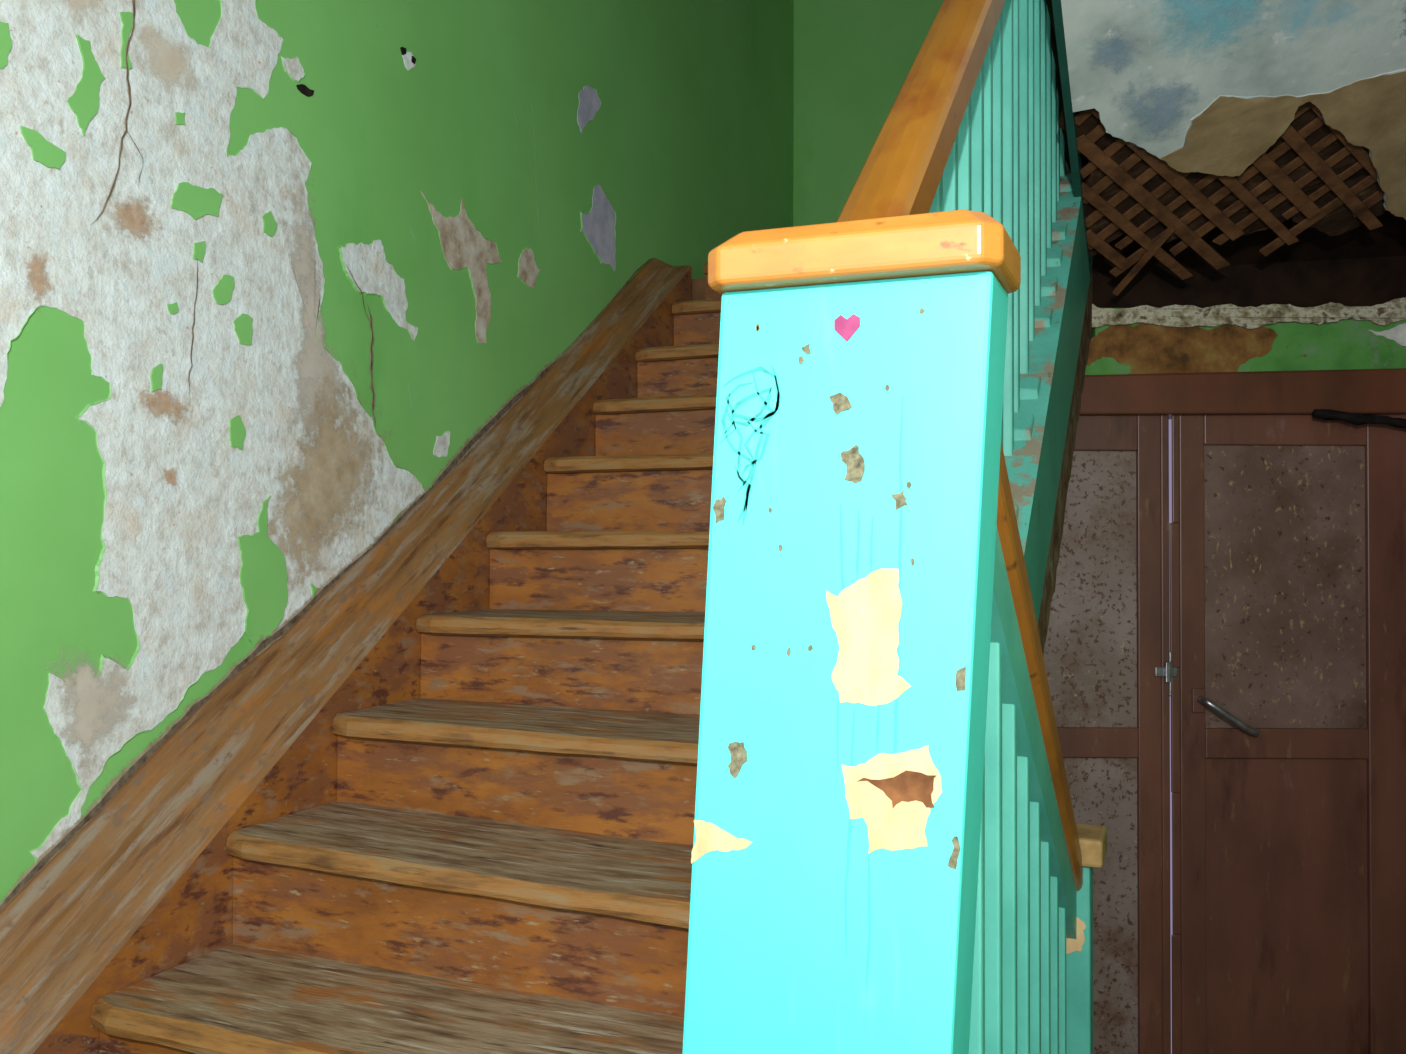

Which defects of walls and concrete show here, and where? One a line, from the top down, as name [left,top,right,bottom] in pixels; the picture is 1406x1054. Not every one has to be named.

crack [92,0,143,224]
peeling [577,85,601,133]
peeling [421,191,540,345]
peeling [580,184,616,272]
peeling [0,0,424,863]
flaking render [1037,68,1406,656]
peeling [1066,917,1086,954]